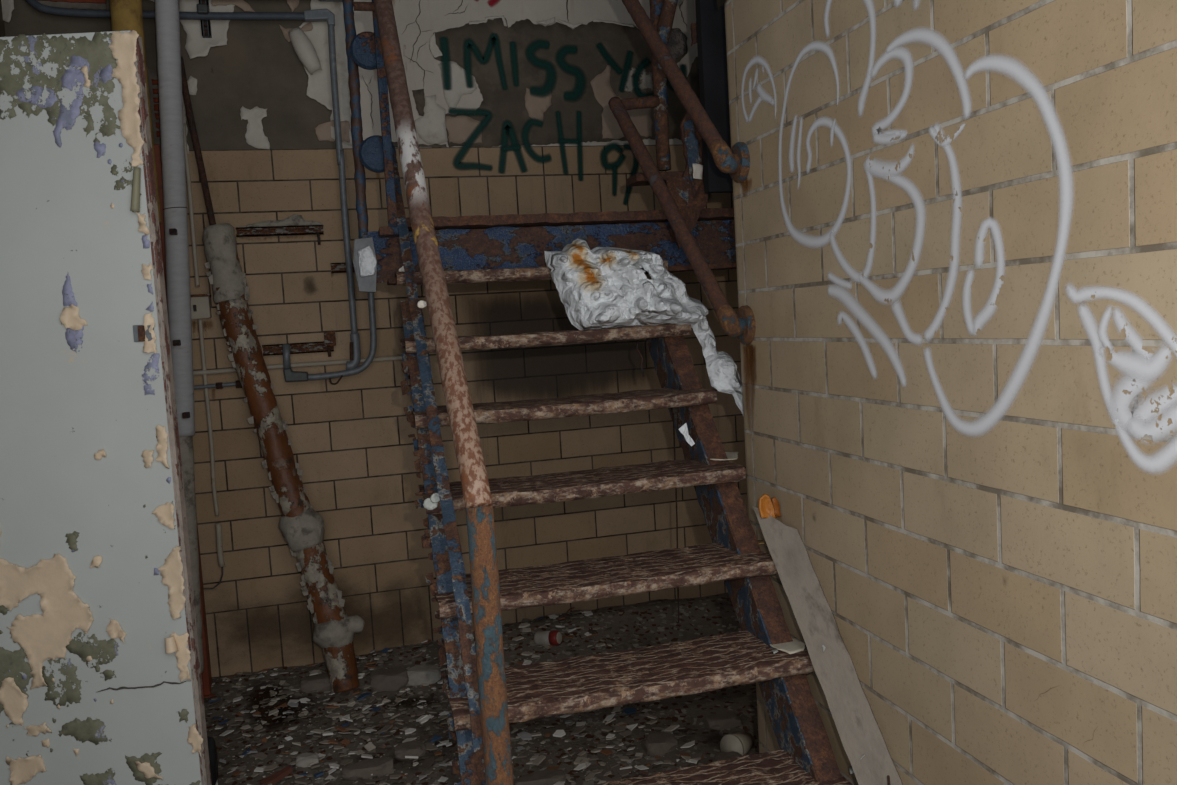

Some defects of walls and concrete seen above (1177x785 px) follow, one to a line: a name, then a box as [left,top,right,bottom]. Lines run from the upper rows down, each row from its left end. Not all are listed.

flaking render [147,67,161,146]
peeling [187,76,197,95]
peeling [179,0,255,59]
peeling [240,106,270,150]
peeling [279,0,364,145]
flaking render [412,15,655,148]
peeling [666,28,700,99]
peeling [667,78,704,198]
rust [743,345,755,405]